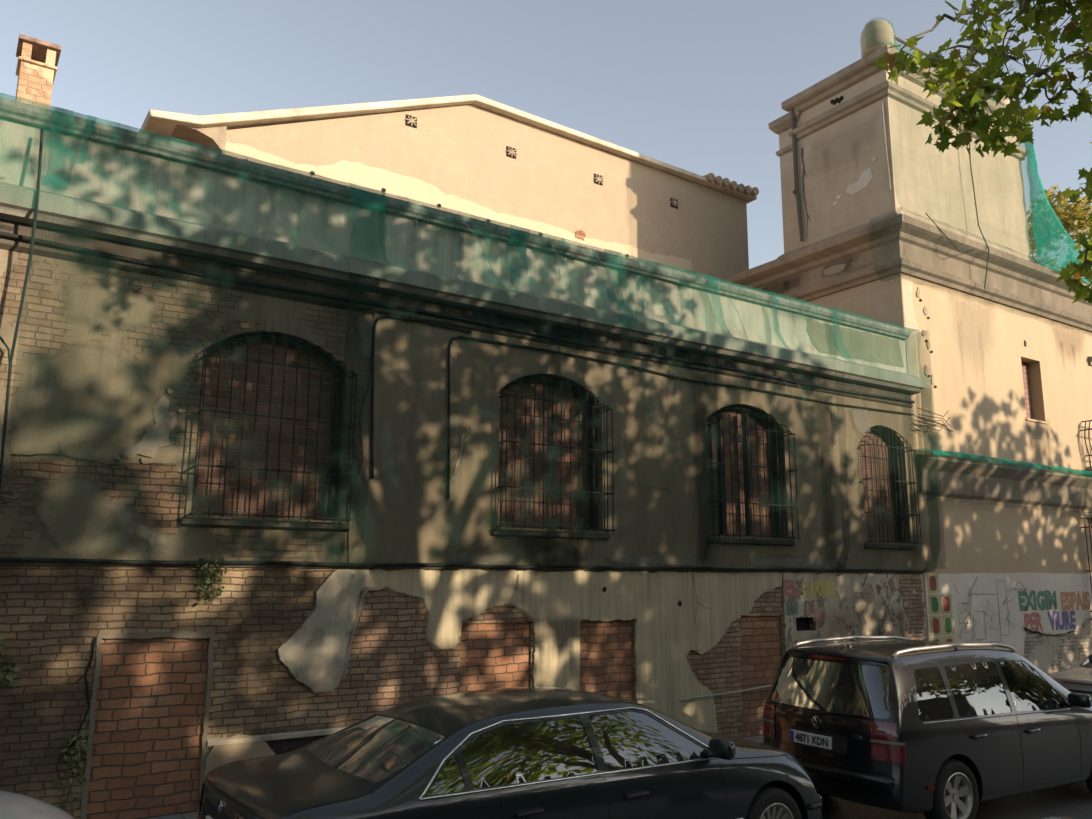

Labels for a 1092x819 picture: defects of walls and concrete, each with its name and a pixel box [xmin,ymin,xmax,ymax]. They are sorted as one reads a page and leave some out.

spalling [833,157,877,205]
spalling [277,569,535,717]
spalling [685,585,782,690]